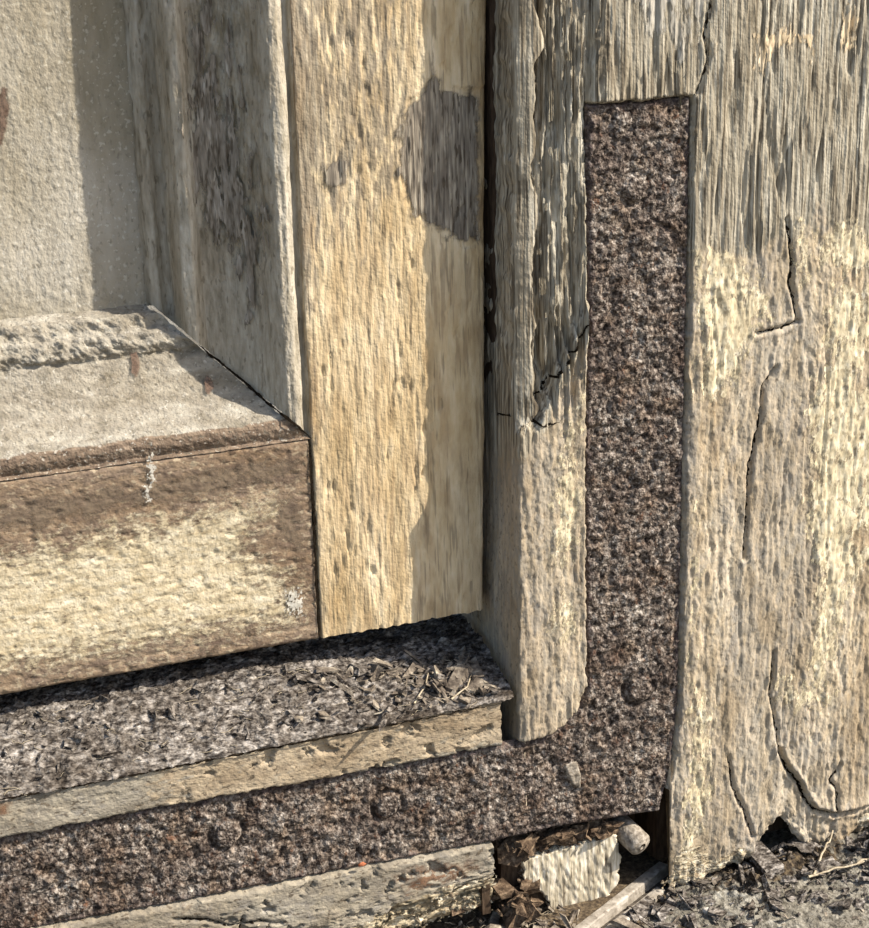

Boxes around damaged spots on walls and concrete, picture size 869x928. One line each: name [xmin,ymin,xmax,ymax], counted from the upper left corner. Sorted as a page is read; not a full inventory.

crack [696,2,711,92]
crack [758,225,796,332]
crack [533,322,590,394]
water stain [0,460,298,528]
crack [497,413,560,428]
crack [742,371,770,551]
crack [768,652,851,813]
crack [727,757,752,835]